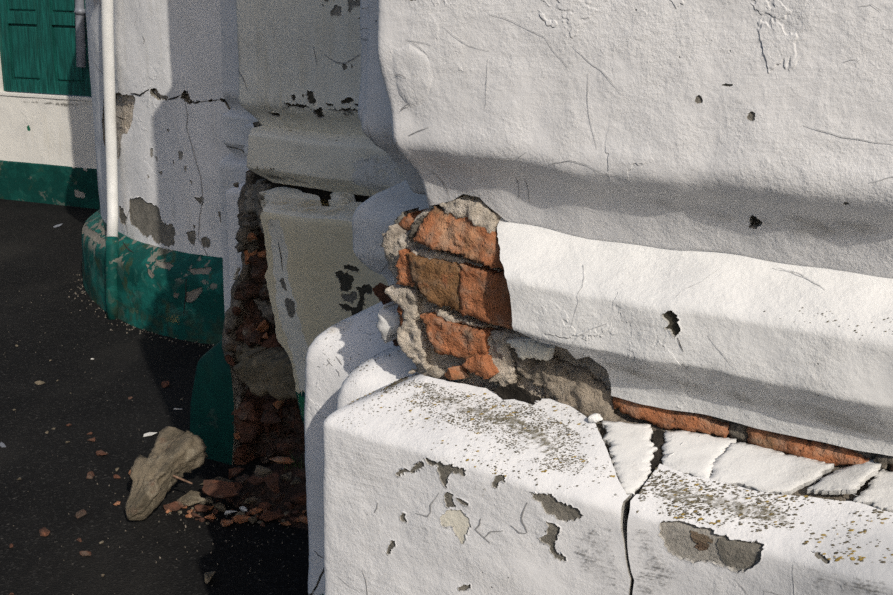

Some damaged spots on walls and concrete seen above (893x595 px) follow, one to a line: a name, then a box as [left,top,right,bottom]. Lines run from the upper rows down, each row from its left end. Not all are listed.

peeling [322,0,360,19]
spalling [266,88,358,121]
crack [168,95,226,256]
crack [253,173,371,207]
peeling [82,222,107,248]
peeling [119,196,211,249]
peeling [172,266,213,304]
peeling [268,219,309,422]
spalling [333,194,893,513]
peeling [394,455,472,545]
peeling [529,490,586,563]
spalling [657,519,768,575]